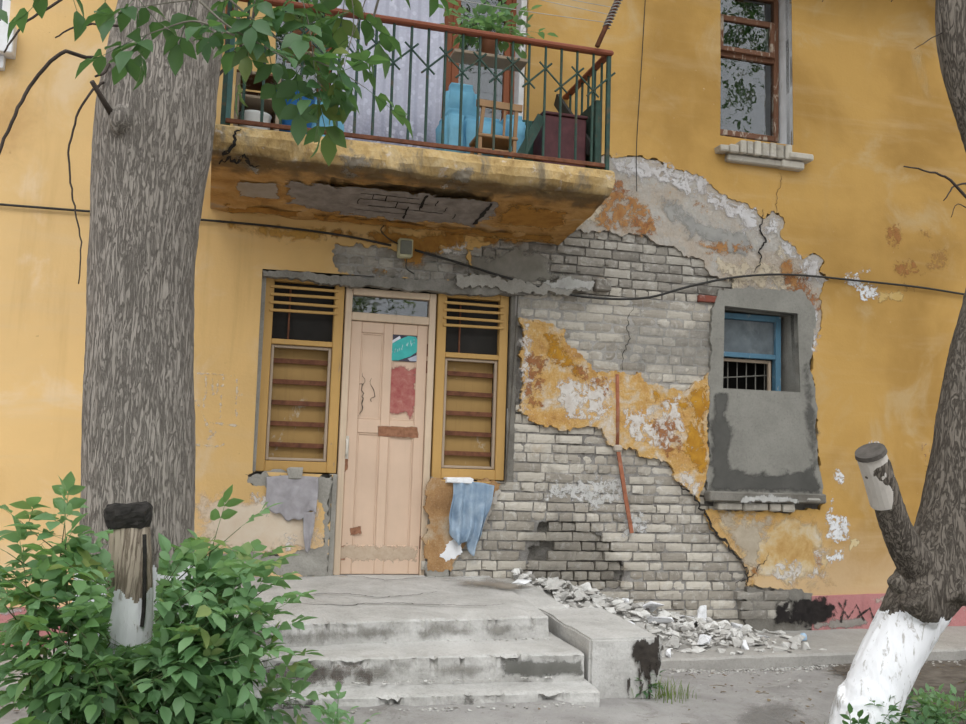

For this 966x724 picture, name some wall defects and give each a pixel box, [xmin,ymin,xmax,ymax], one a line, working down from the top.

crack [219,129,259,168]
spalling [236,155,499,228]
peeling [845,269,903,302]
flaking render [332,155,828,631]
corrosion [613,445,634,533]
peeling [198,492,314,553]
peeling [807,498,860,562]